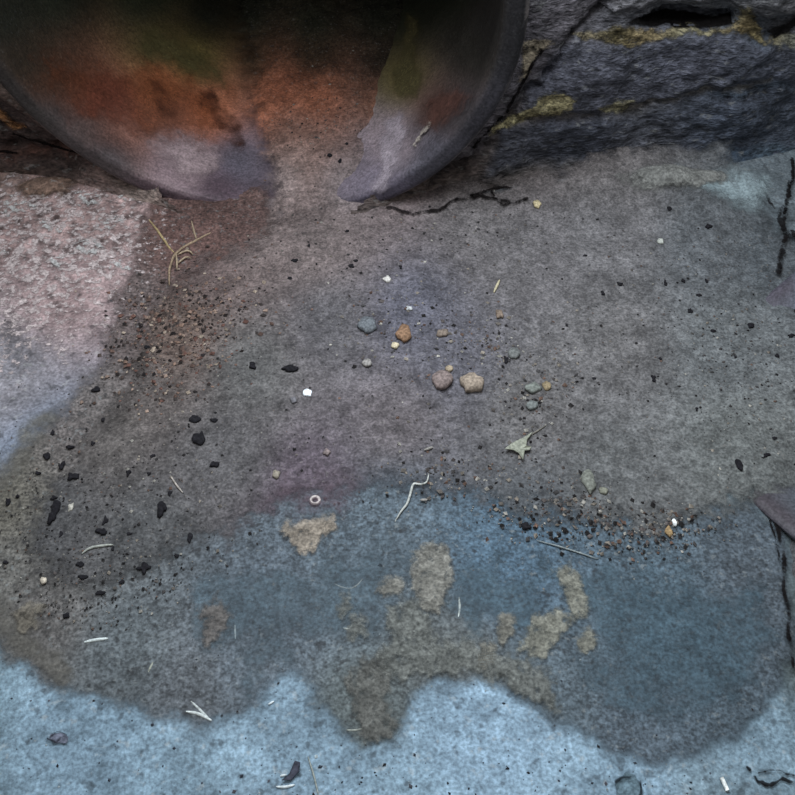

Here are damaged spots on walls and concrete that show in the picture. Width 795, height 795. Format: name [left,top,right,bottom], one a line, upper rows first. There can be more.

crack [386,186,528,215]
crack [759,157,795,274]
leakage [0,172,795,765]
crack [769,520,795,668]